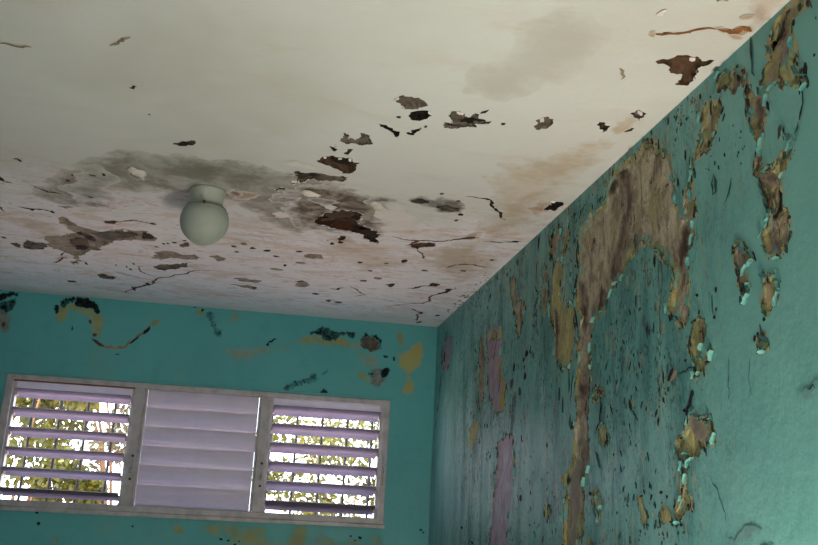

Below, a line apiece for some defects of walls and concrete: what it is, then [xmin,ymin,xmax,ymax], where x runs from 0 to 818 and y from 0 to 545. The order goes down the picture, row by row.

rust [648,15,755,40]
spalling [443,110,491,129]
crack [0,185,60,213]
leakage [31,149,420,272]
spalling [407,193,466,221]
crack [466,196,505,220]
leakage [417,138,618,282]
spalling [0,217,225,272]
crack [392,232,519,259]
leakage [568,235,578,328]
peeling [525,0,812,545]
peeling [292,326,382,352]